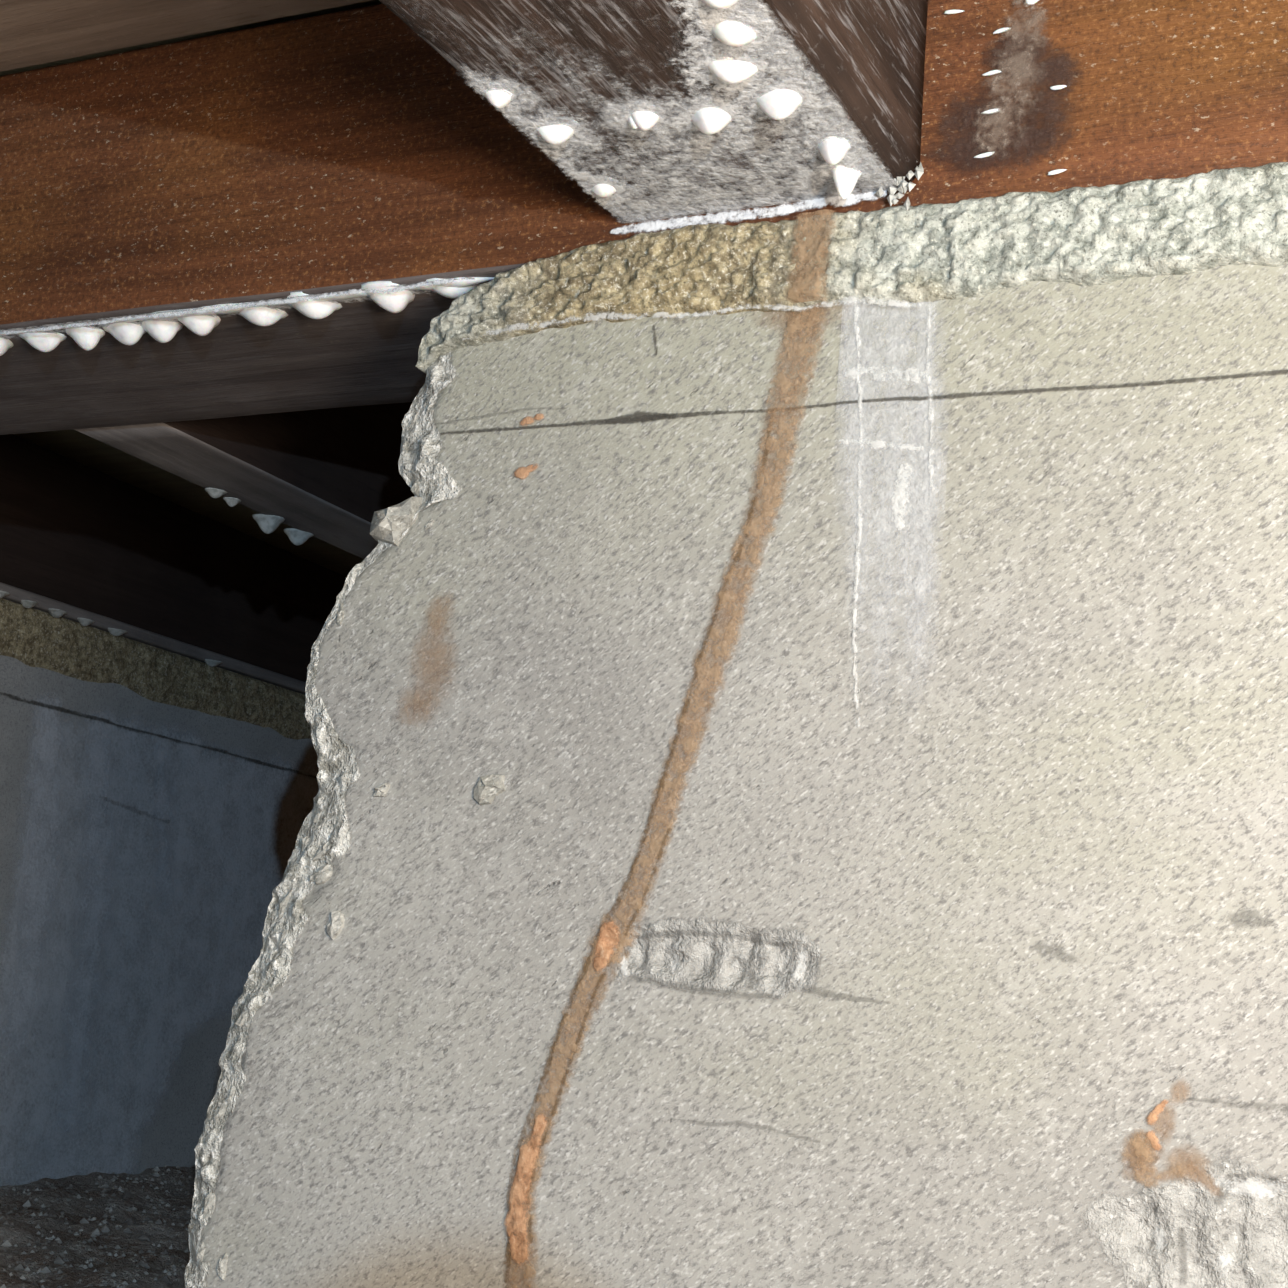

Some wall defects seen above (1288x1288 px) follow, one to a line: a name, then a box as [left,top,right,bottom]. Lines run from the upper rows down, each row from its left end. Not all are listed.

leakage [939,0,1080,171]
leakage [839,301,933,486]
corrosion [514,464,537,479]
leakage [892,465,908,528]
leakage [852,514,861,726]
crack [441,209,1288,1288]
spalling [610,918,821,999]
corrosion [1124,1087,1220,1195]
spalling [1084,1159,1288,1288]